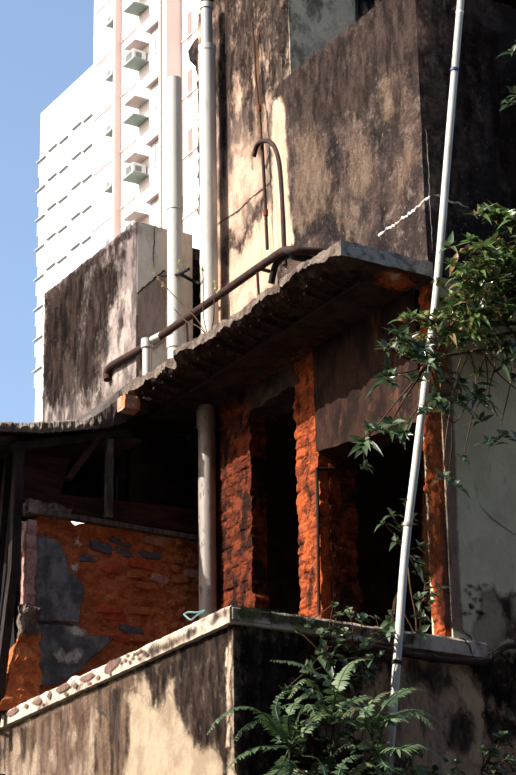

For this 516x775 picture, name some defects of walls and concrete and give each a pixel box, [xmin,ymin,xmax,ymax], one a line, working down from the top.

leakage [213,0,442,157]
leakage [459,14,516,211]
leakage [38,220,139,413]
crack [136,226,166,350]
peeling [422,340,516,651]
spalling [0,631,149,716]
leakage [0,608,415,775]
leakage [443,652,516,755]